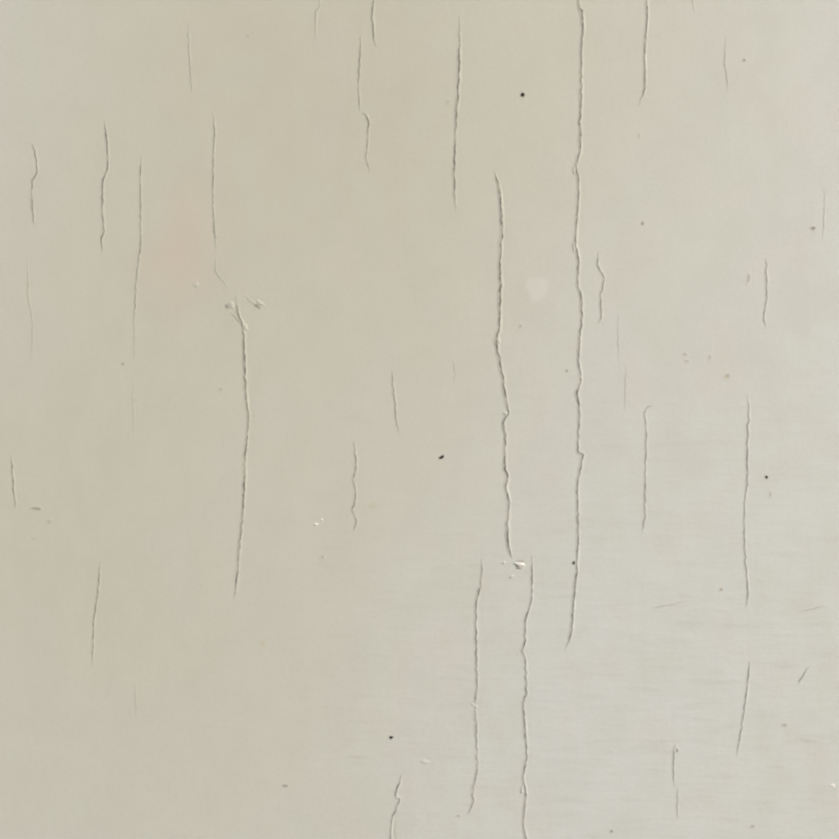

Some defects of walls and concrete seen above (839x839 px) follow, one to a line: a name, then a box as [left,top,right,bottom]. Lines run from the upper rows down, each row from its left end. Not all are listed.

crack [30,143,39,225]
crack [100,119,110,252]
crack [357,0,377,172]
crack [452,15,462,211]
crack [211,111,256,599]
crack [565,0,653,651]
crack [350,441,359,532]
crack [493,171,535,839]
crack [742,394,751,608]
crack [389,775,402,839]
crack [467,557,484,815]
crack [736,661,751,757]